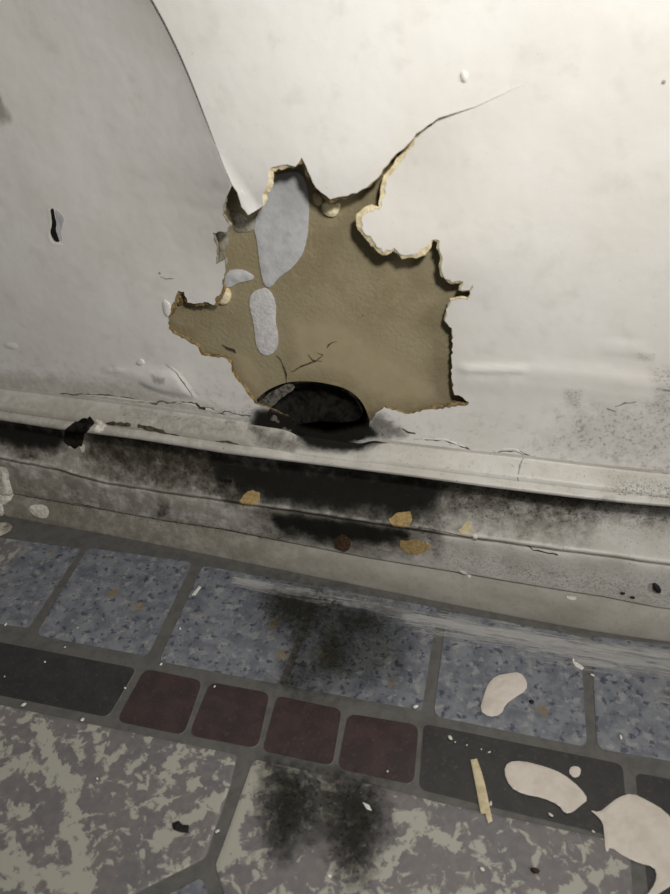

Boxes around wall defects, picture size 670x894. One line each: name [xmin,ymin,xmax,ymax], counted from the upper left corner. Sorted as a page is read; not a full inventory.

peeling [47,208,64,246]
peeling [153,0,584,433]
leakage [0,422,64,457]
leakage [237,409,402,451]
leakage [89,434,669,547]
leakage [231,577,670,692]
leakage [264,771,379,873]